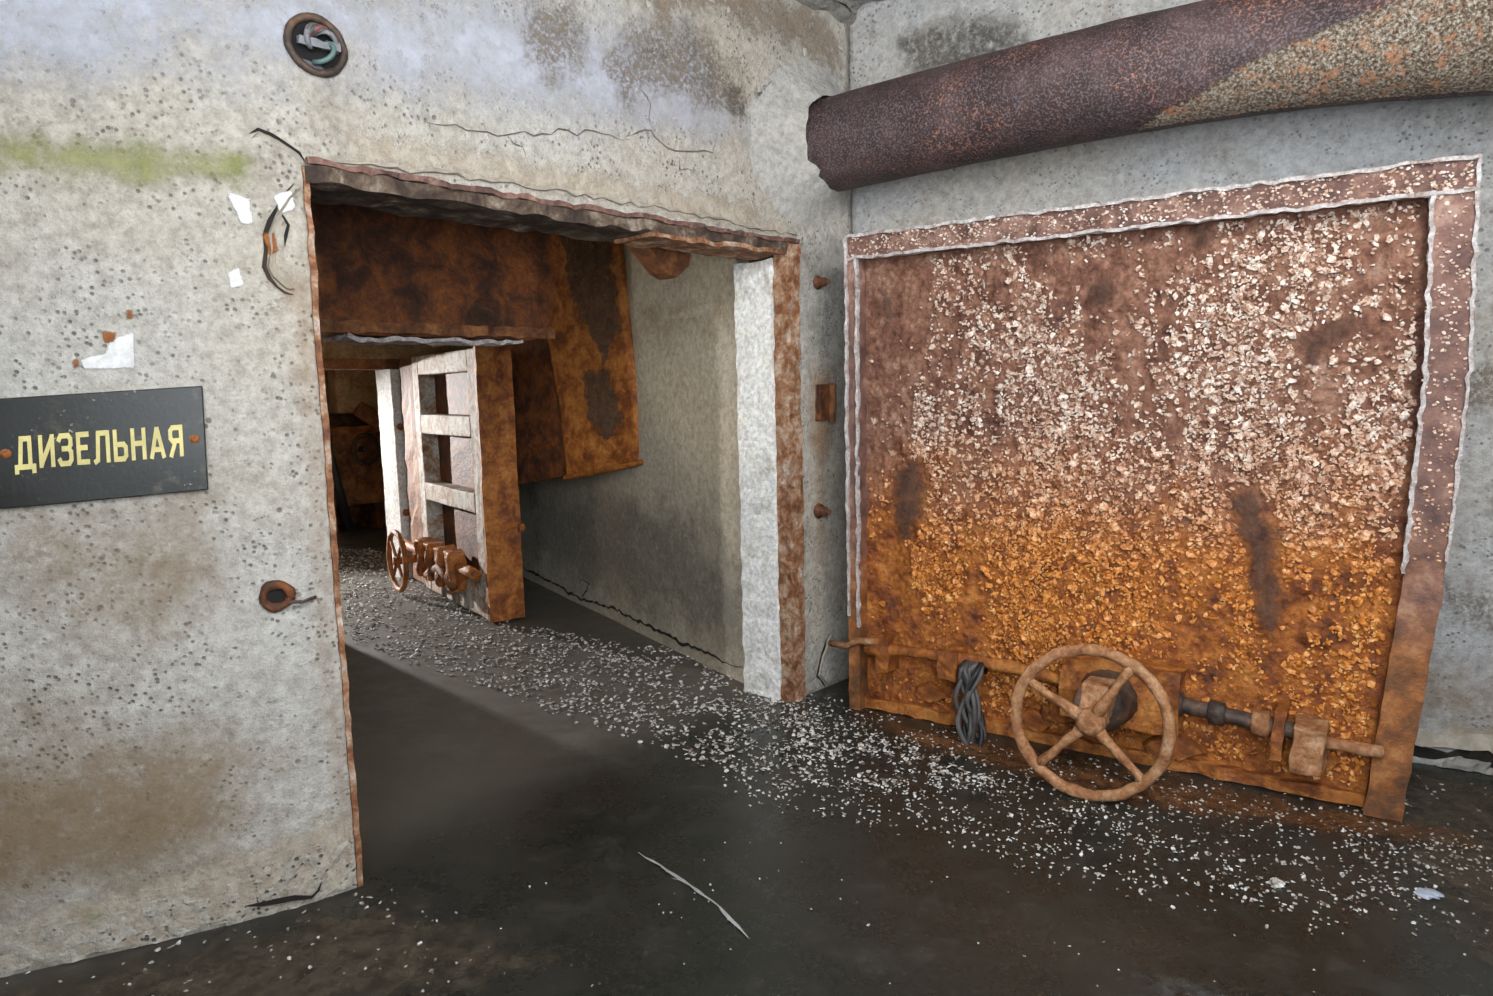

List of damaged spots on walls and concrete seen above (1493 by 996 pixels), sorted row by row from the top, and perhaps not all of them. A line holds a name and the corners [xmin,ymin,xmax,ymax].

water stain [0,0,200,66]
water stain [230,0,721,128]
corrosion [1022,701,1075,733]
water stain [0,759,221,876]
corrosion [890,723,1473,845]